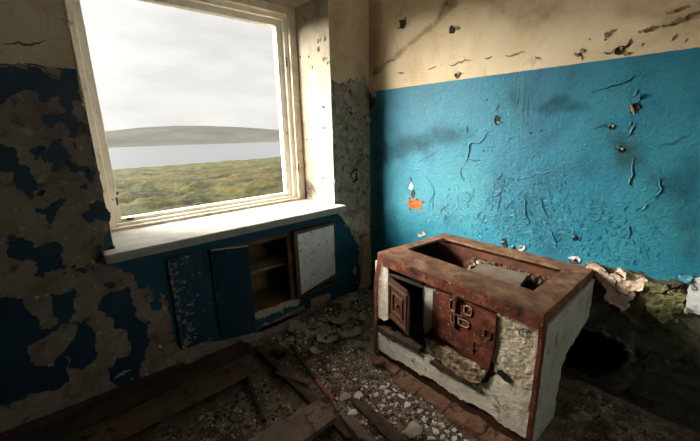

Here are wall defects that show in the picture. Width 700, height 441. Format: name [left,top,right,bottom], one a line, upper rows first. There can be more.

spalling [638,5,696,34]
crack [2,39,46,47]
spalling [604,39,633,56]
crack [591,75,638,95]
peeling [317,76,376,290]
flaking render [408,177,423,210]
crack [427,126,559,249]
crack [627,159,635,187]
crack [642,177,663,210]
peeling [0,0,333,433]
spalling [561,256,700,433]